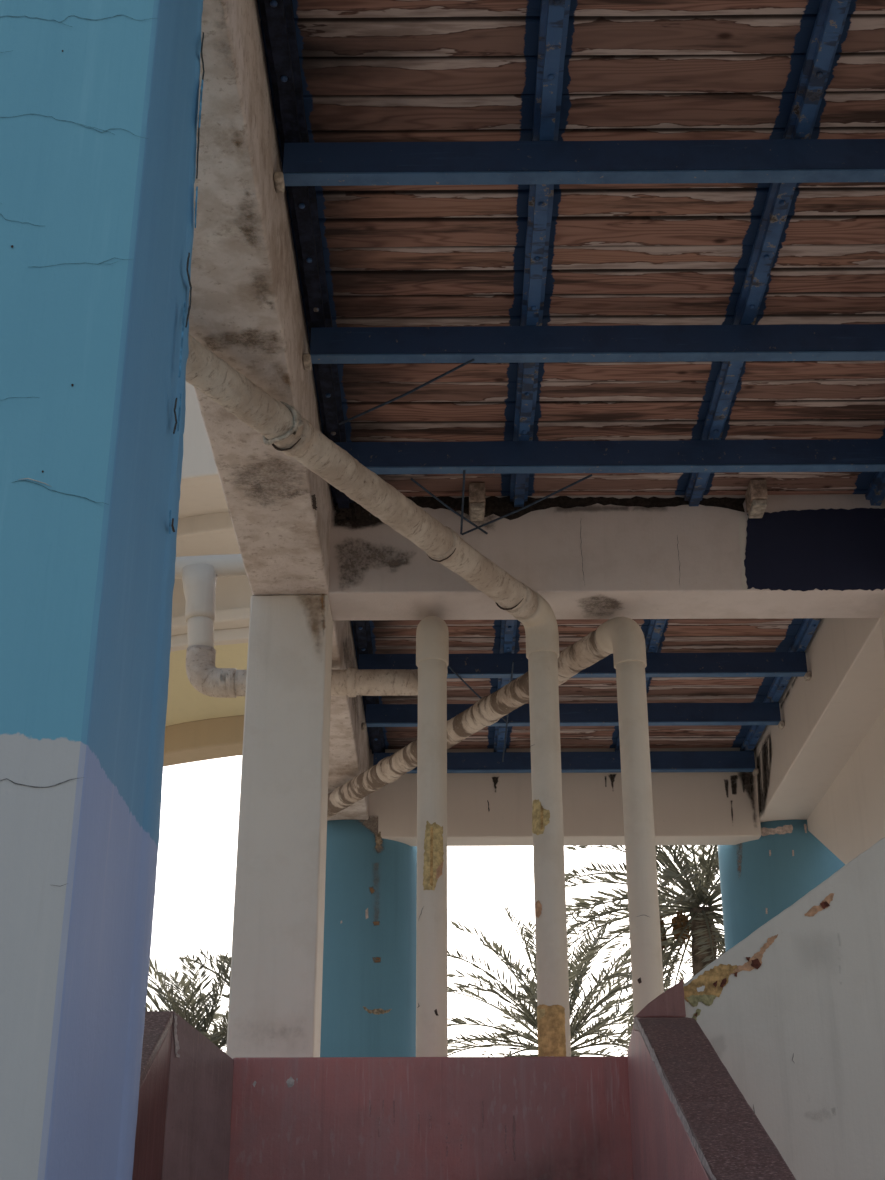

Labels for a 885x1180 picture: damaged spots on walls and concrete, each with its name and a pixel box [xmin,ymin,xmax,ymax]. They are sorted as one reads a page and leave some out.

crack [0,15,153,27]
crack [0,114,148,139]
crack [12,478,109,505]
damp [333,501,409,584]
crack [0,777,84,788]
peeling [532,799,550,835]
peeling [423,821,444,890]
peeling [804,893,834,917]
peeling [684,934,778,1021]
peeling [537,1004,567,1057]